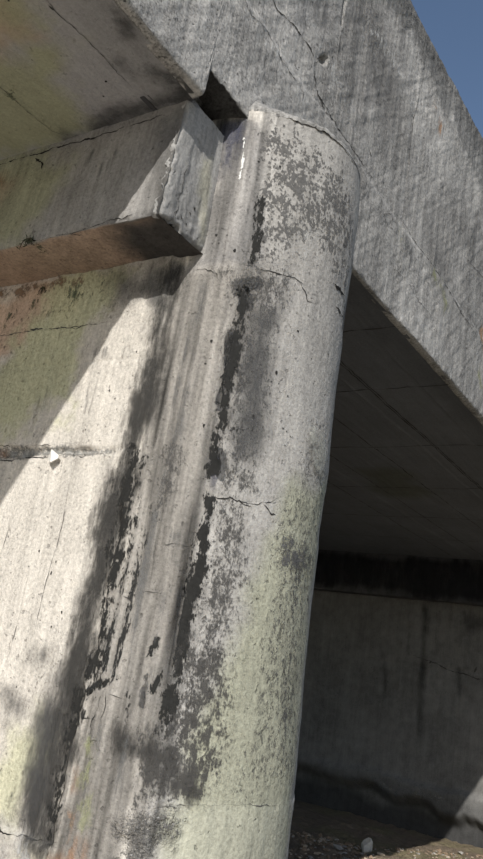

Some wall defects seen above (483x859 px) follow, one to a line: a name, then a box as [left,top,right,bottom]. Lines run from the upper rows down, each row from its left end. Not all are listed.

crack [48,2,133,89]
crack [0,87,169,169]
crack [241,2,483,346]
leakage [248,195,266,264]
crack [0,321,107,336]
crack [0,442,116,462]
crack [215,497,277,516]
leakage [17,264,183,859]
leakage [113,313,274,810]
leakage [234,417,483,801]
spalling [112,802,183,859]